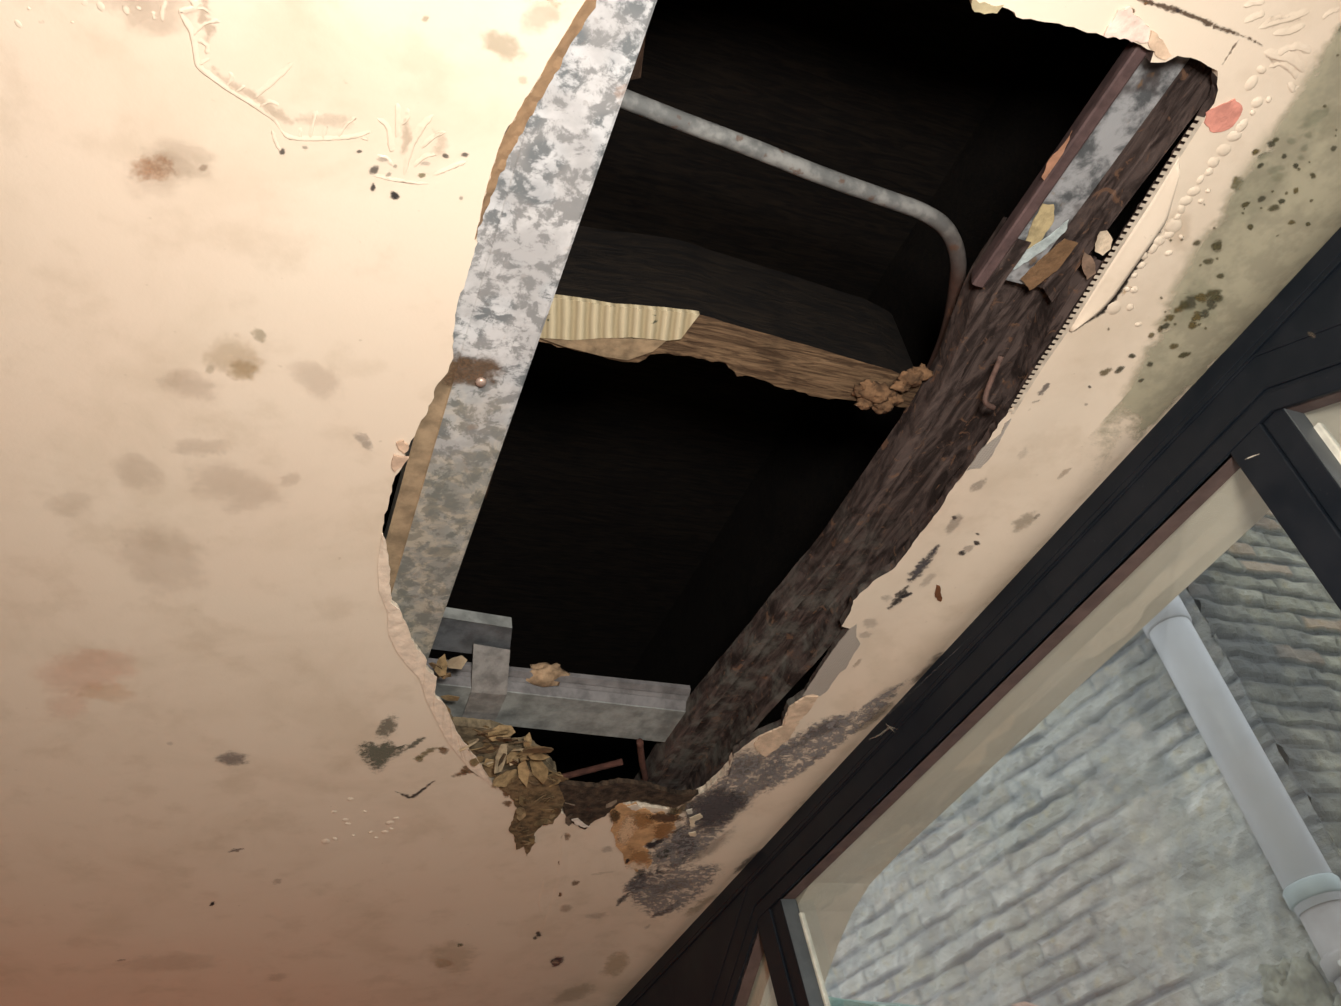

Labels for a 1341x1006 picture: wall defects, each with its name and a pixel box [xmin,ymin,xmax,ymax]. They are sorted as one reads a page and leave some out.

peeling [1103,6,1172,60]
crack [1132,0,1256,60]
spalling [474,0,597,240]
damp [1088,27,1341,432]
flaking render [428,654,451,679]
damp [359,718,447,770]
peeling [754,695,818,757]
flaking render [440,695,703,872]
damp [617,685,900,917]